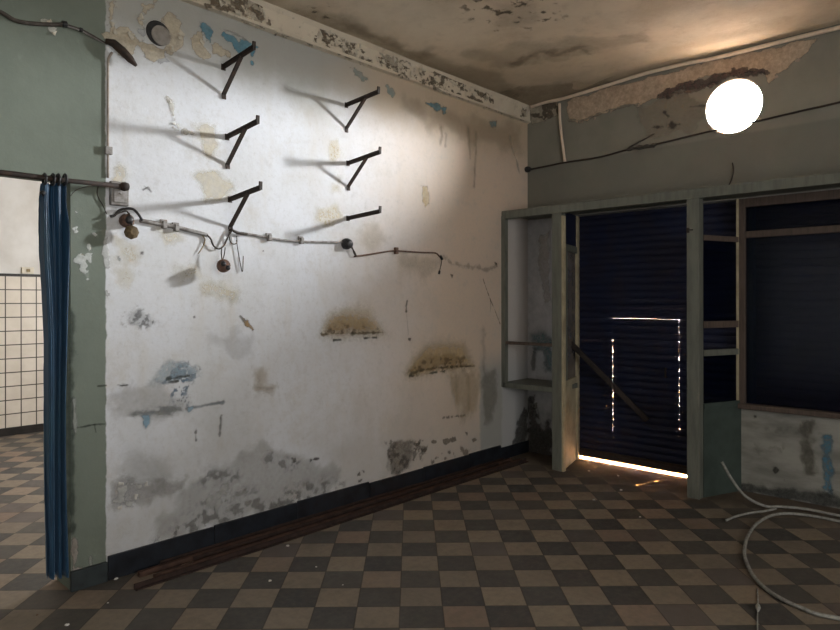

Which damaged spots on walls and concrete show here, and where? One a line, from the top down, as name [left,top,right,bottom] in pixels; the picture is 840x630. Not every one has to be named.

peeling [102,0,258,65]
peeling [204,0,289,37]
peeling [307,29,494,109]
flaking render [657,67,770,99]
peeling [73,232,109,280]
water stain [133,364,200,427]
water stain [512,395,552,456]
water stain [389,441,425,475]
water stain [741,421,840,507]